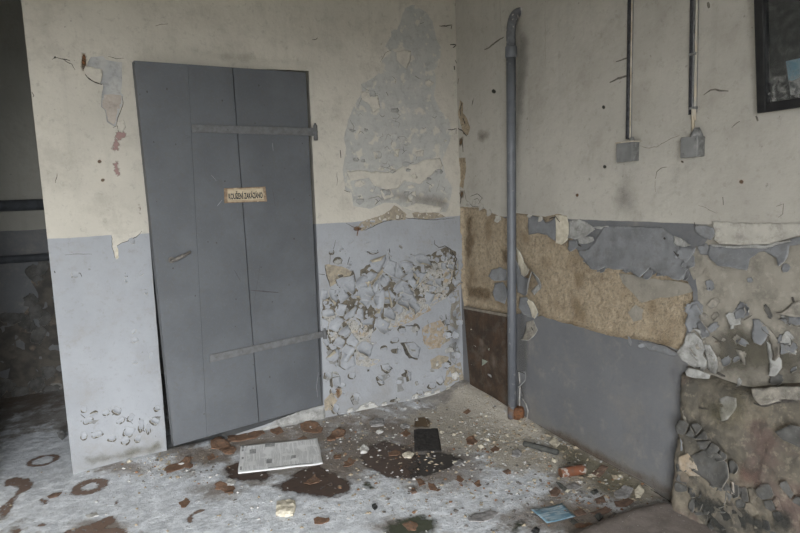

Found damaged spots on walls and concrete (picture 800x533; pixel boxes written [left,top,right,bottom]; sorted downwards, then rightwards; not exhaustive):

spalling [84,56,126,132]
peeling [112,229,143,259]
spalling [321,5,800,415]
peeling [0,250,64,399]
peeling [80,405,161,445]